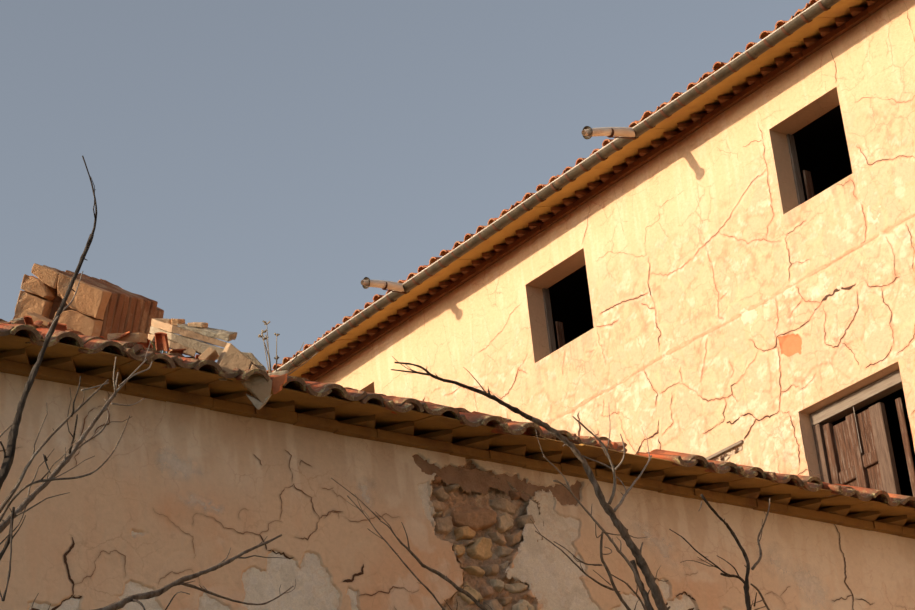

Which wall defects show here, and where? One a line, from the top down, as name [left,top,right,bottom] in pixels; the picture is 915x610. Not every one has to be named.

flaking render [545,206,915,424]
crack [577,125,915,476]
crack [32,537,126,610]
peeling [119,581,162,610]
crack [157,450,399,586]
peeling [242,551,358,610]
crack [343,564,417,596]
spalling [412,454,599,610]
peeling [612,593,644,610]
peeling [658,579,696,610]
crack [656,560,706,610]
crack [832,524,871,610]